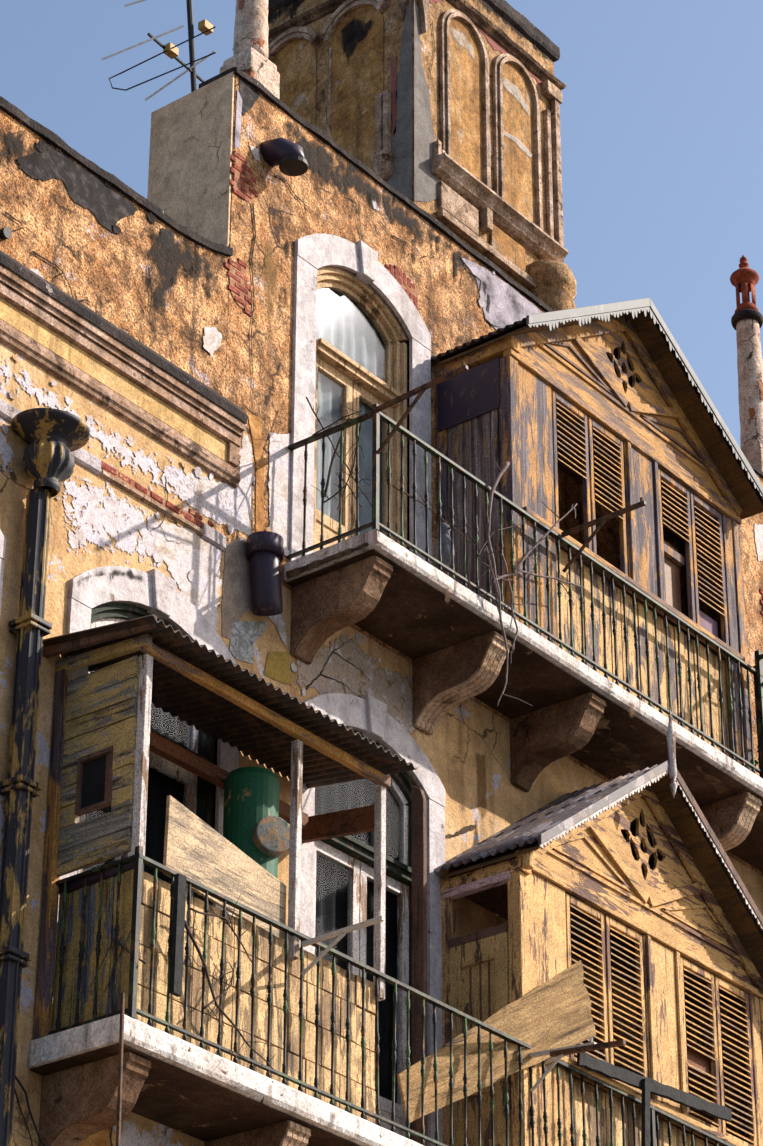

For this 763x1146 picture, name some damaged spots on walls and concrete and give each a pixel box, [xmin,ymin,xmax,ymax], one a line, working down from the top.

peeling [462,258,543,330]
peeling [0,354,291,631]
peeling [79,1119,194,1146]